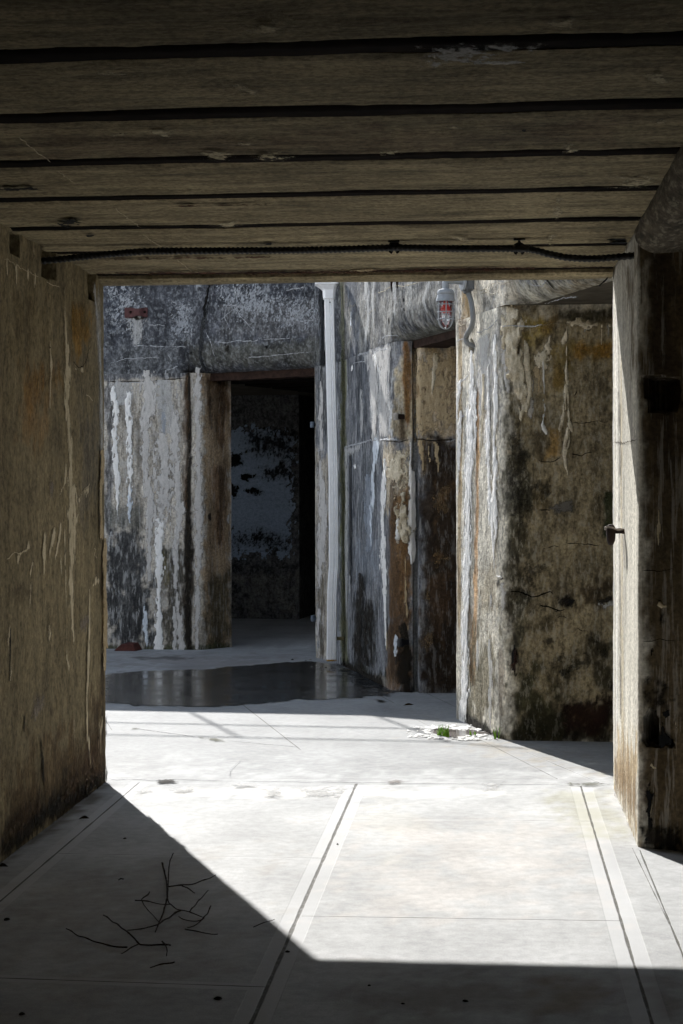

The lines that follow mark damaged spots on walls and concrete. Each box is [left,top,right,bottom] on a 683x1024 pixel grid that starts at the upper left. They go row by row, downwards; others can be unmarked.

water stain [216,283,326,367]
water stain [8,285,229,763]
water stain [315,282,398,702]
rust [388,480,414,693]
water stain [412,334,573,740]
water stain [546,448,623,764]
water stain [639,782,682,851]